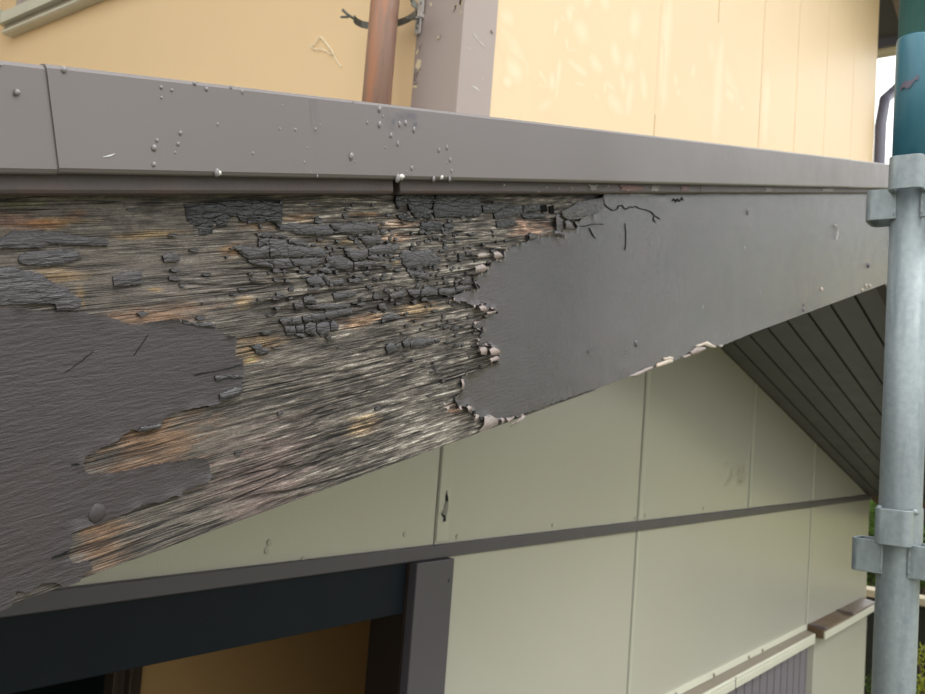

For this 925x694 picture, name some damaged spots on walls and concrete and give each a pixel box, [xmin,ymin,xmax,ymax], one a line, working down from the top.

peeling [0,184,604,579]
crack [578,197,684,250]